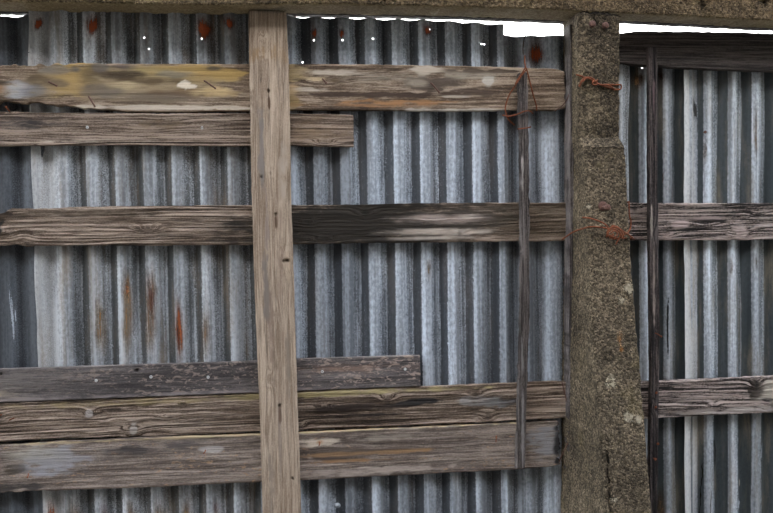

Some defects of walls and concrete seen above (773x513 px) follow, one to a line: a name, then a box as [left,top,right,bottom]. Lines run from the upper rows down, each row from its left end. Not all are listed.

rust [123,277,132,341]
rust [145,275,157,346]
rust [175,306,183,351]